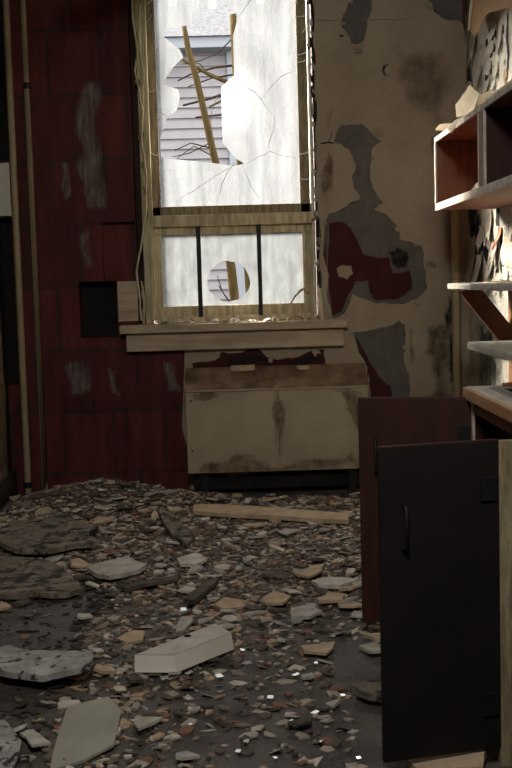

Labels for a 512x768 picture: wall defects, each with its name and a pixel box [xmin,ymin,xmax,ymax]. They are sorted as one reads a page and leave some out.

peeling [307,19,320,127]
flaking render [341,0,372,54]
peeling [424,0,512,133]
flaking render [311,124,427,318]
flaking render [351,321,410,397]